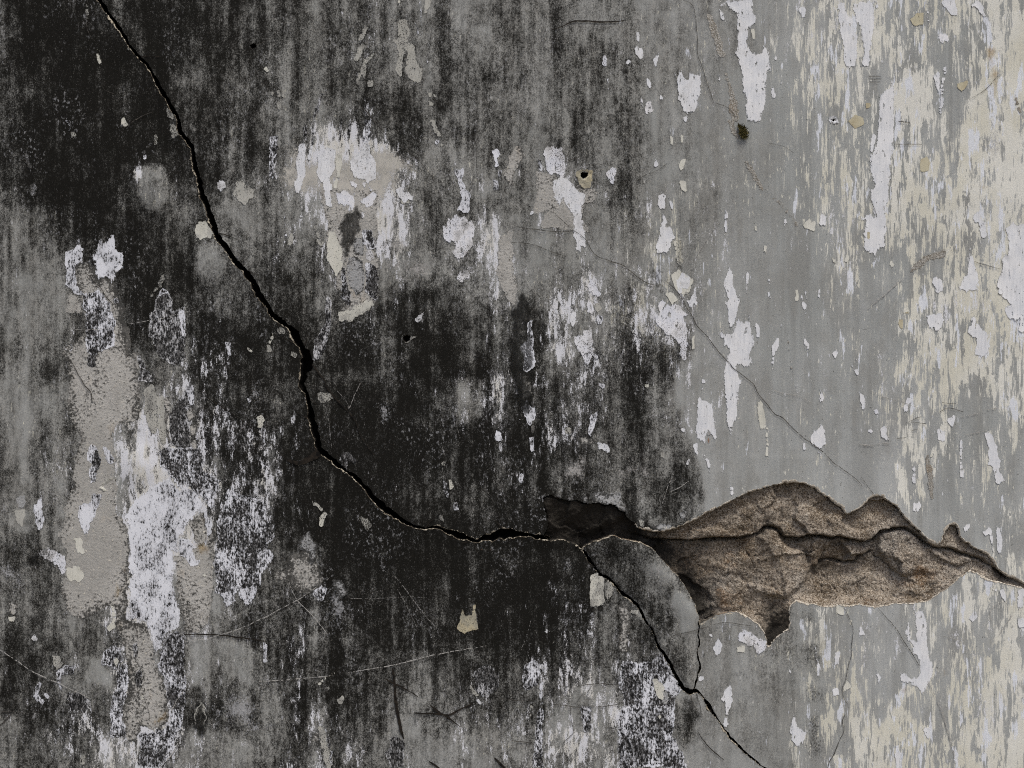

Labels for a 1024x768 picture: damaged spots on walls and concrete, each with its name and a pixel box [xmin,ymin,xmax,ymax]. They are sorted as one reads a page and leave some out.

crack [551,20,625,30]
peeling [719,0,782,122]
crack [86,0,550,560]
peeling [269,89,417,361]
water stain [510,293,533,416]
peeling [530,146,617,255]
crack [512,218,874,494]
peeling [40,235,348,768]
water stain [193,703,207,736]
crack [384,668,617,743]
crack [579,545,766,768]
flaking render [543,454,1024,693]